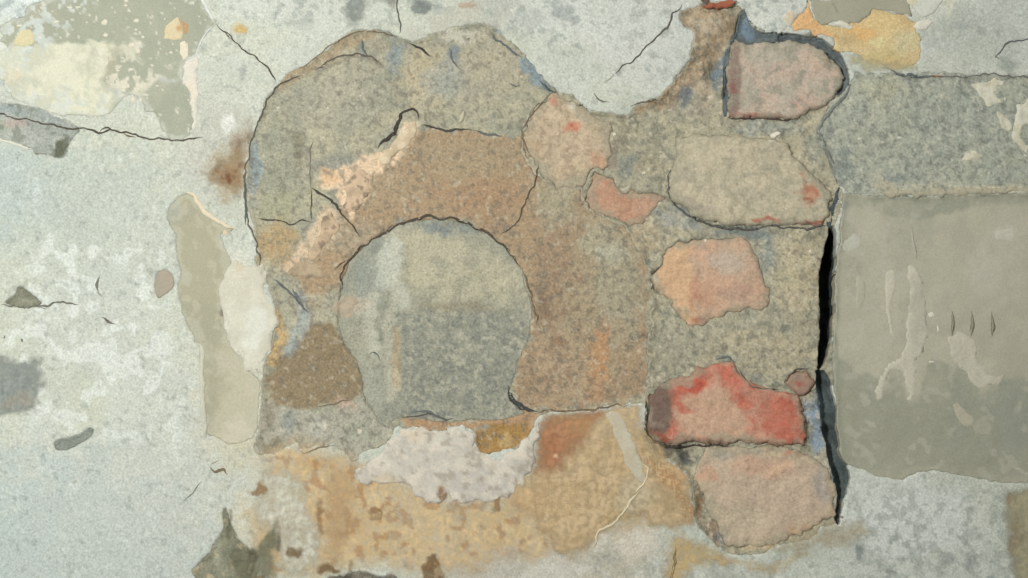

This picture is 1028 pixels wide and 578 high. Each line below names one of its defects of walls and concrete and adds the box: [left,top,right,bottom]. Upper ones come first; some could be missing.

crack [0,113,201,141]
peeling [0,0,217,158]
crack [595,0,710,106]
peeling [805,0,943,38]
crack [887,38,1028,79]
peeling [971,78,1028,157]
flaking render [154,0,861,555]
crack [667,10,850,525]
peeling [875,264,1004,401]
flaking render [192,508,252,578]
peeling [1007,490,1028,578]